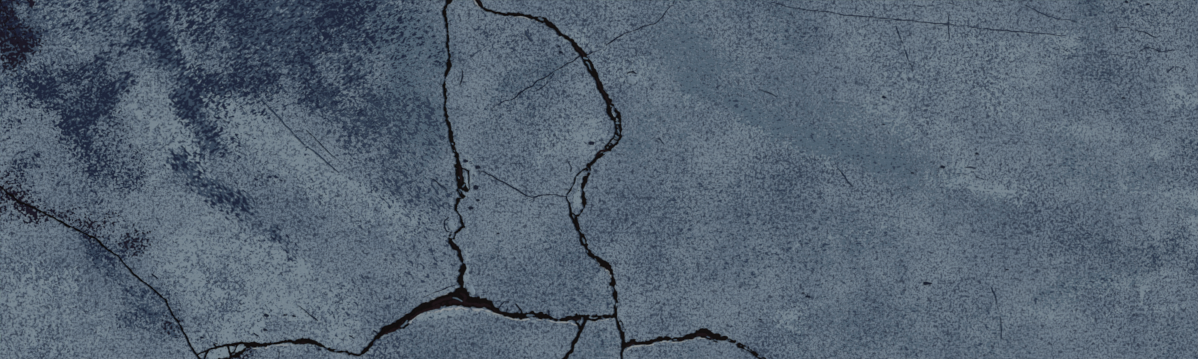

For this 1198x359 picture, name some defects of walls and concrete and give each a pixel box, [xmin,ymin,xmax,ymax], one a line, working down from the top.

crack [0,0,766,359]